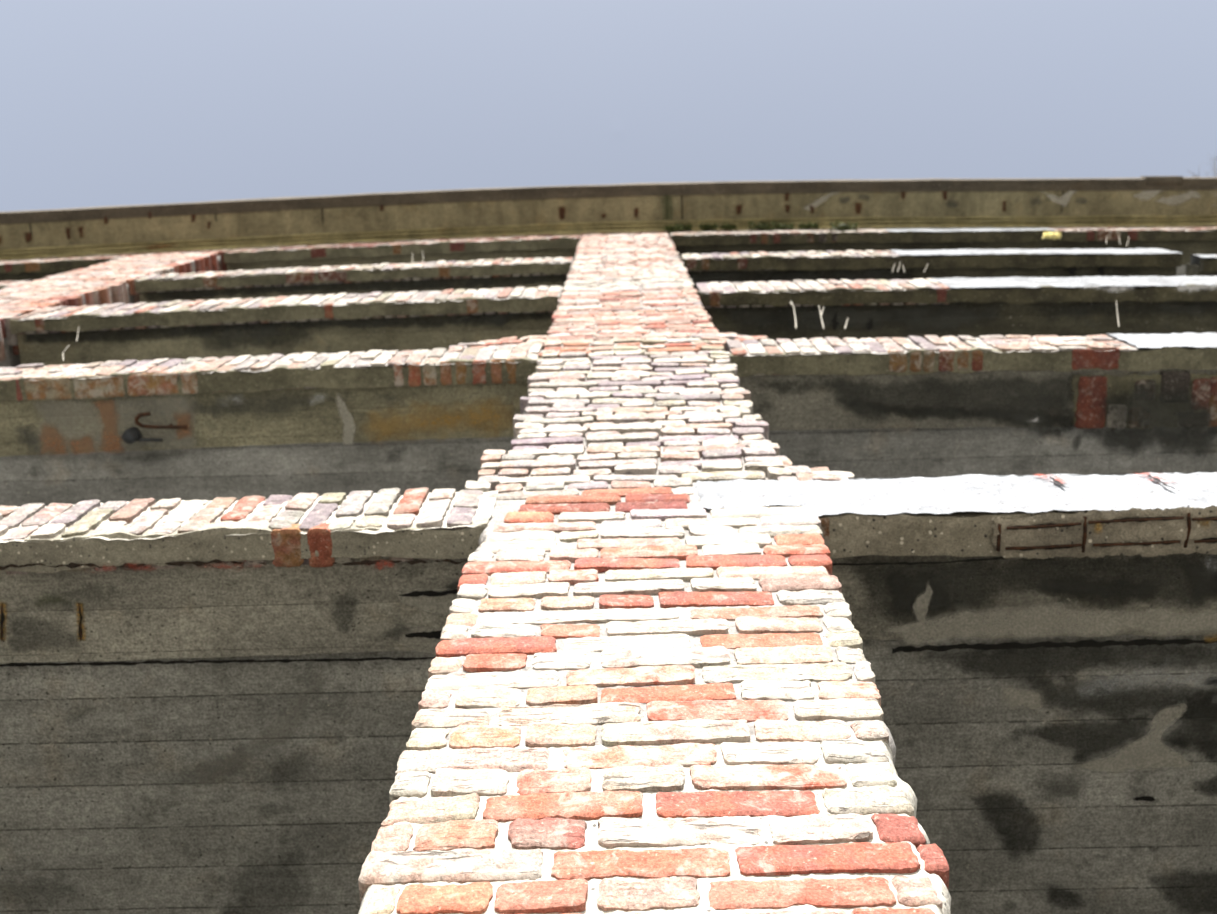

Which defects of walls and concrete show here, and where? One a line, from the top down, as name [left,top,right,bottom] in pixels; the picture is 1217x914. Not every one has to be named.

spalling [1071,348,1217,429]
spalling [992,505,1217,559]
water stain [855,553,1217,772]
water stain [1199,778,1217,795]
water stain [981,794,1038,854]
water stain [1050,888,1080,906]
water stain [1156,872,1217,914]